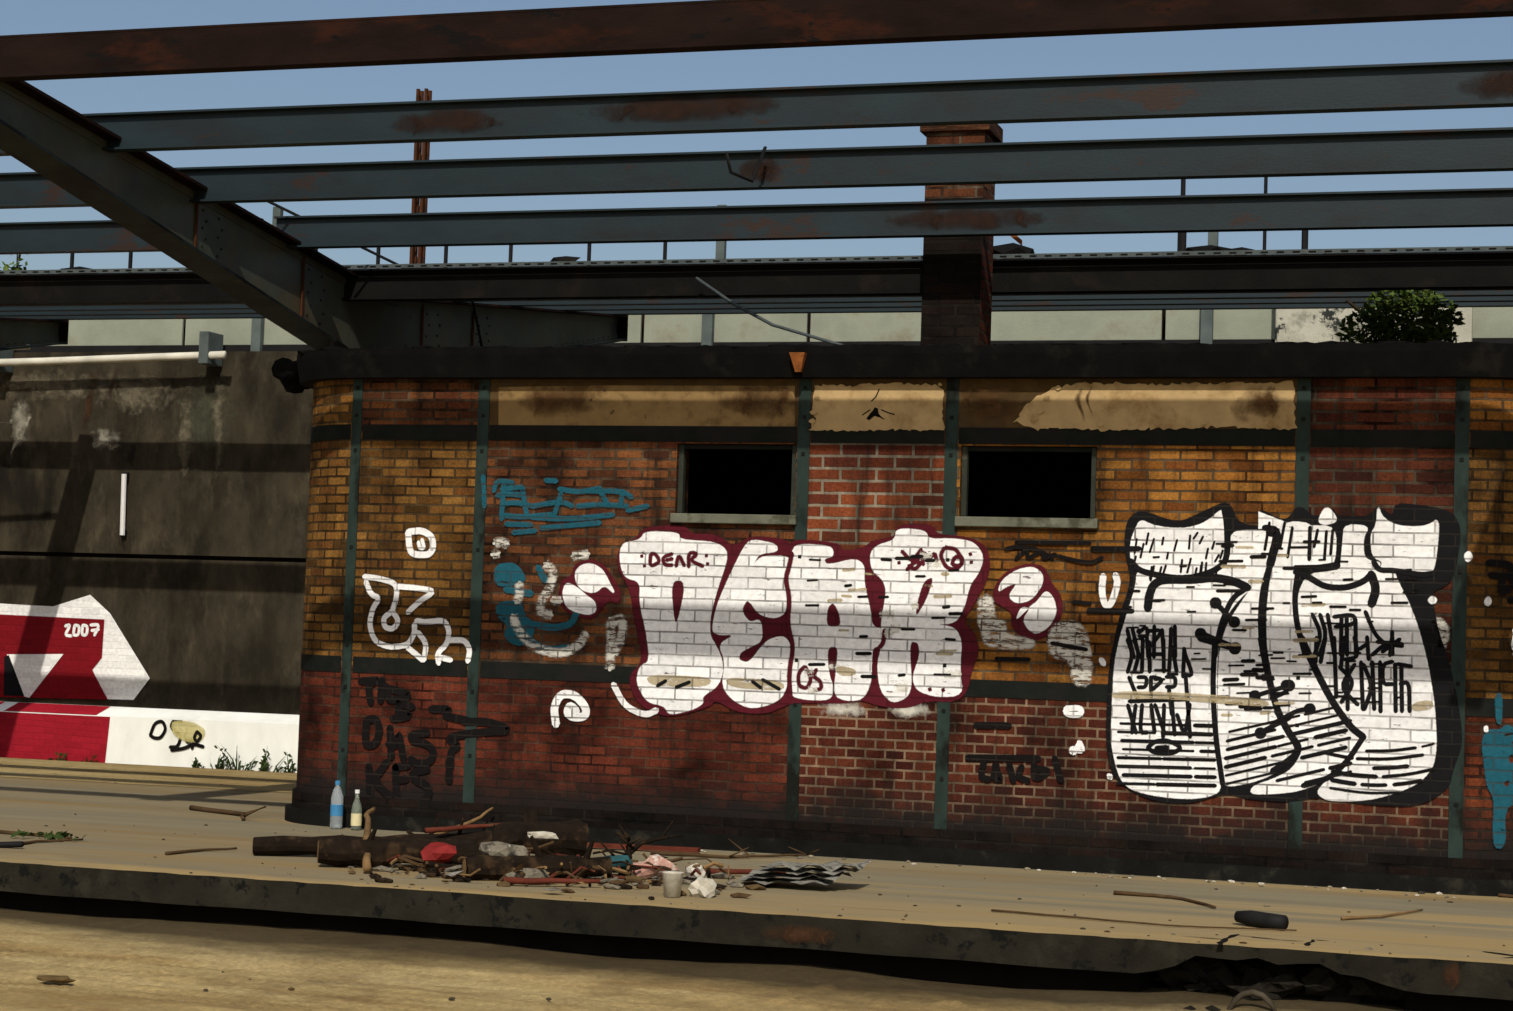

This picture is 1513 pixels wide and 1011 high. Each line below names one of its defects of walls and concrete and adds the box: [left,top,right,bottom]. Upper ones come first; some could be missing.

rust [612,96,770,120]
peeling [809,382,945,432]
peeling [1013,380,1297,432]